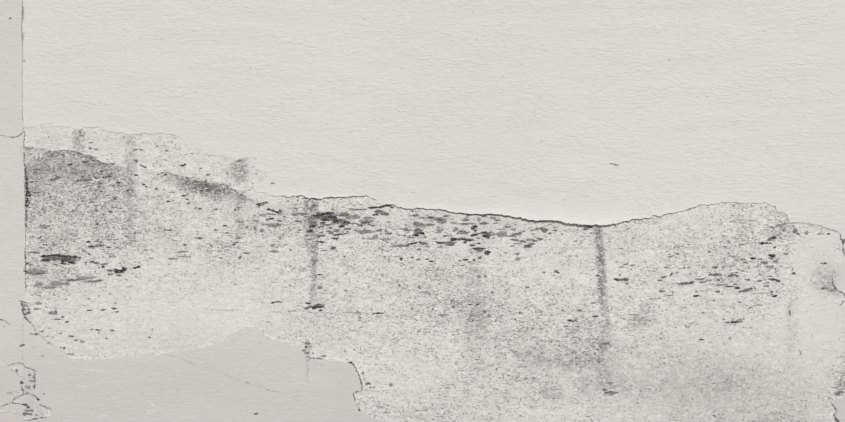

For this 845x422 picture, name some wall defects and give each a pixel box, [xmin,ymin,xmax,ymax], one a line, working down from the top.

peeling [20,123,845,422]
damp [594,230,607,311]
peeling [9,363,51,420]